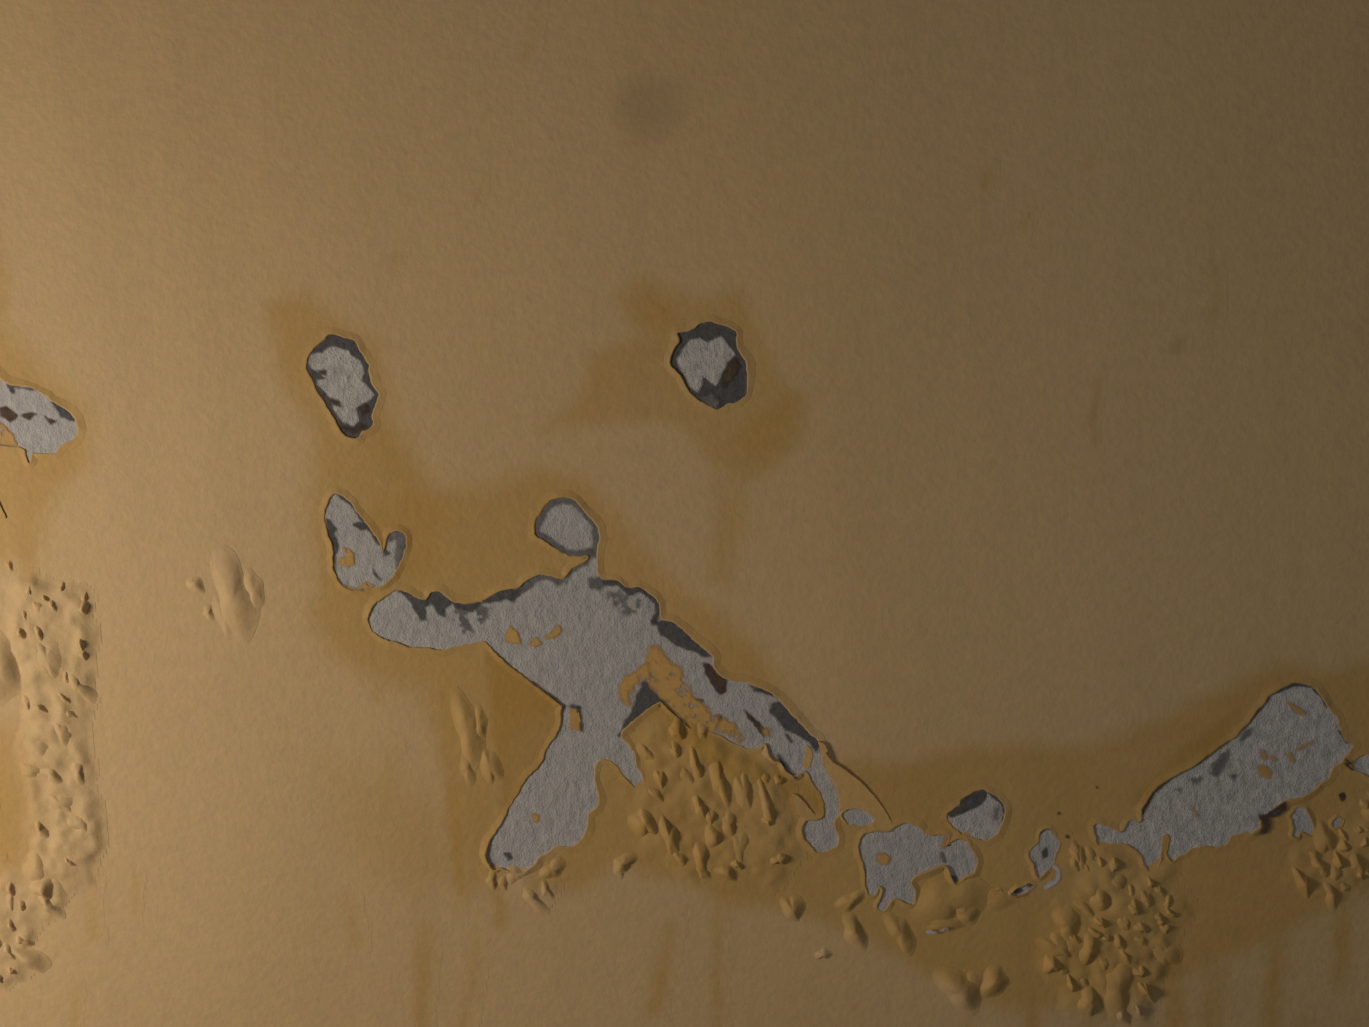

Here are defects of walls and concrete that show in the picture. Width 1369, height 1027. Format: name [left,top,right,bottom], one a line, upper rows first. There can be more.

peeling [318,486,1011,916]